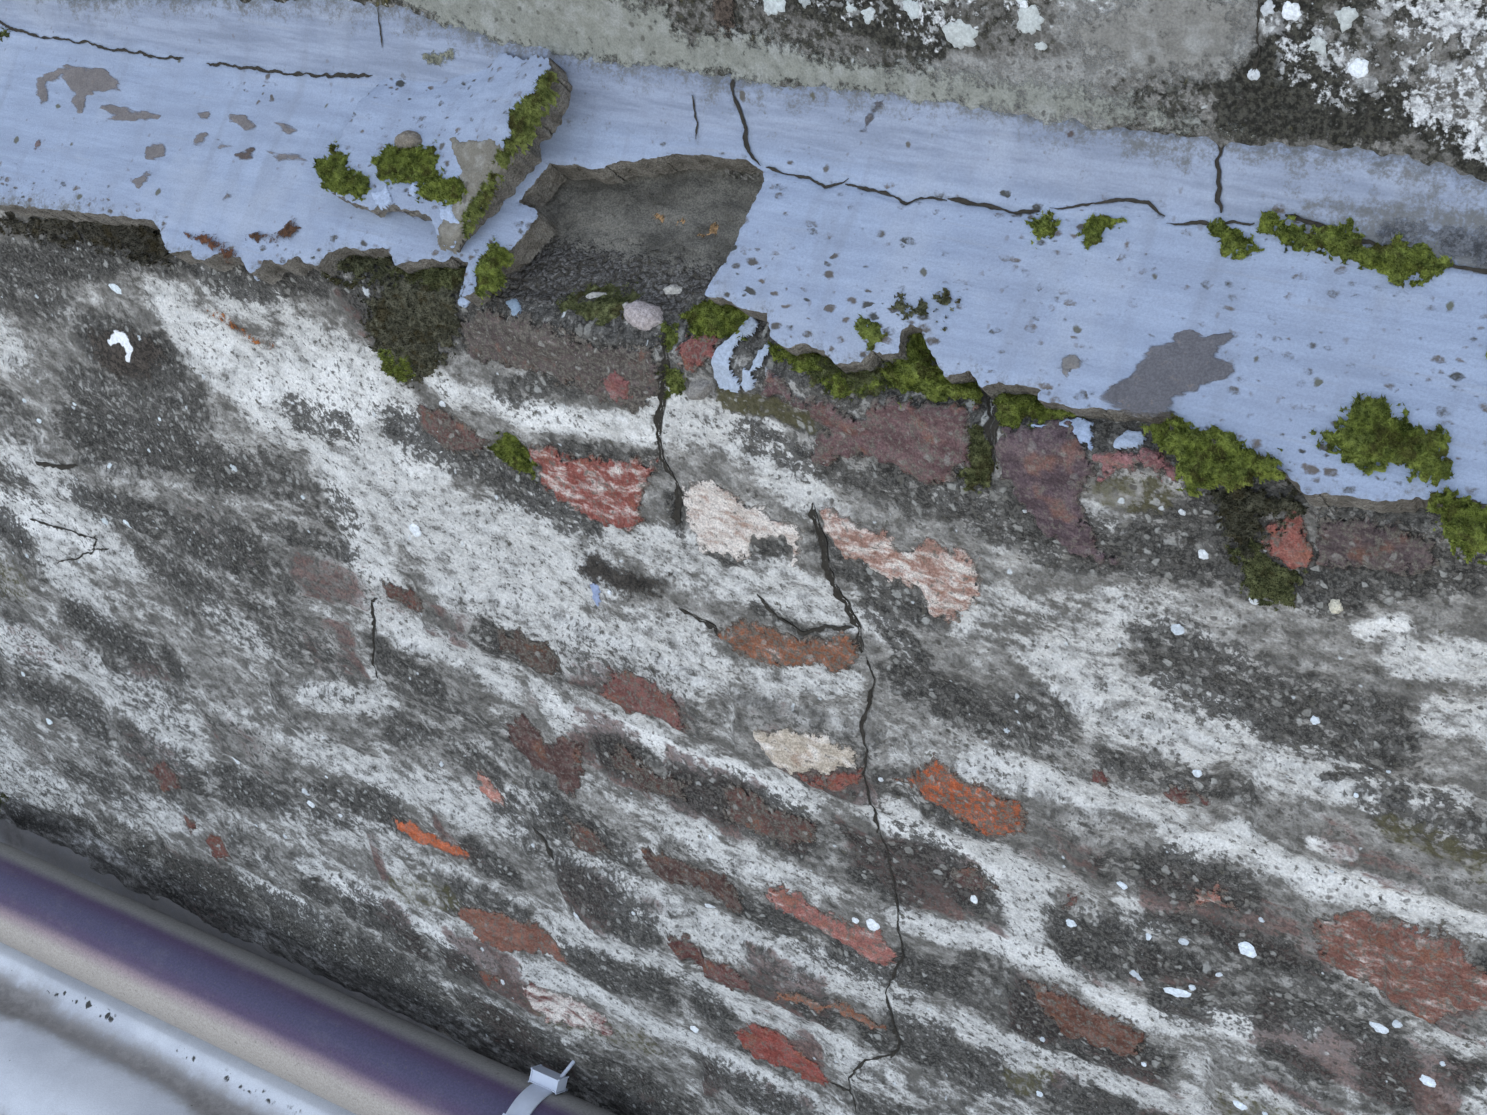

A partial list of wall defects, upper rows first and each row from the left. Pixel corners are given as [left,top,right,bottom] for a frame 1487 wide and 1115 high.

crack [0,5,382,78]
crack [728,0,1326,228]
spalling [0,204,159,231]
crack [1361,238,1375,246]
crack [1452,264,1487,274]
spalling [168,53,1234,570]
crack [653,324,683,525]
flaking render [381,578,425,616]
crack [679,607,719,637]
crack [757,503,904,1113]